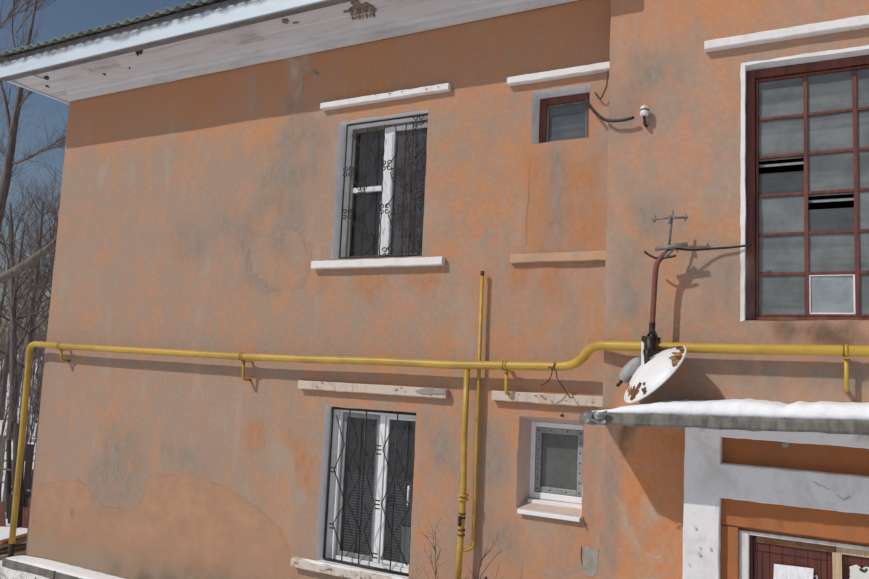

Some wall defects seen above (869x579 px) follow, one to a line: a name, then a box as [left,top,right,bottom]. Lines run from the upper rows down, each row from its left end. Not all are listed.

water stain [807,324,853,344]
spalling [580,546,599,577]